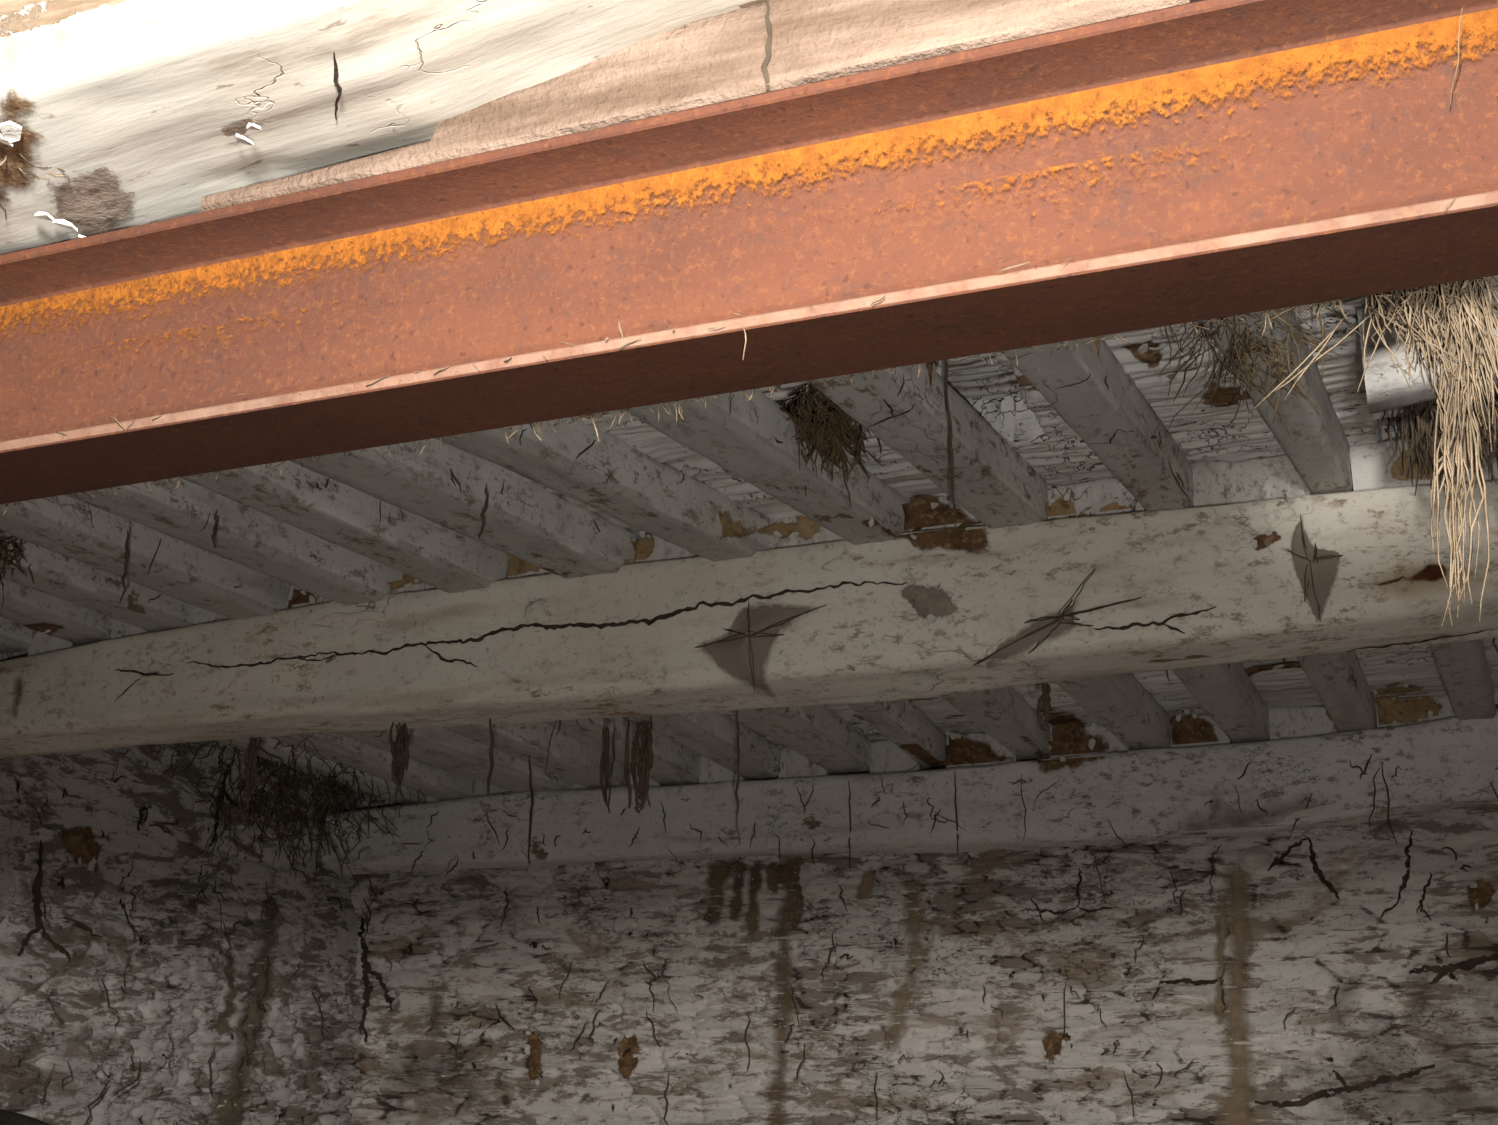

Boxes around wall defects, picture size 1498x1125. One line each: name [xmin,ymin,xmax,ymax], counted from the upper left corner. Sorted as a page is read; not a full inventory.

crack [761,0,772,91]
spalling [0,89,43,202]
spalling [34,167,134,238]
spalling [222,119,261,145]
rust [0,8,1498,366]
spalling [862,494,988,553]
crack [114,581,907,702]
crack [1094,606,1216,634]
crack [357,917,393,1043]
leakage [707,856,804,1125]
leakage [1215,867,1259,1125]
crack [1409,953,1498,984]